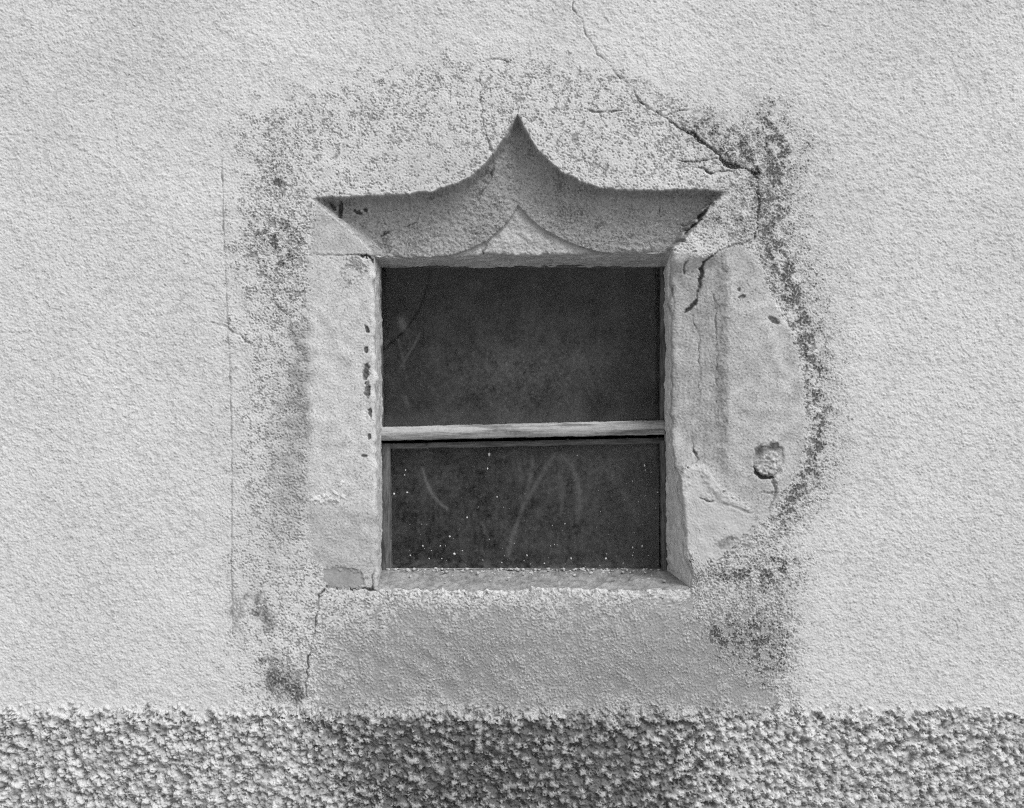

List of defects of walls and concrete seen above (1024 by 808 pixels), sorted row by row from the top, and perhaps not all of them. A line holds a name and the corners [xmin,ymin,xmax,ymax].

crack [589,96,761,237]
crack [683,252,717,322]
spalling [680,88,853,690]
crack [315,575,377,625]